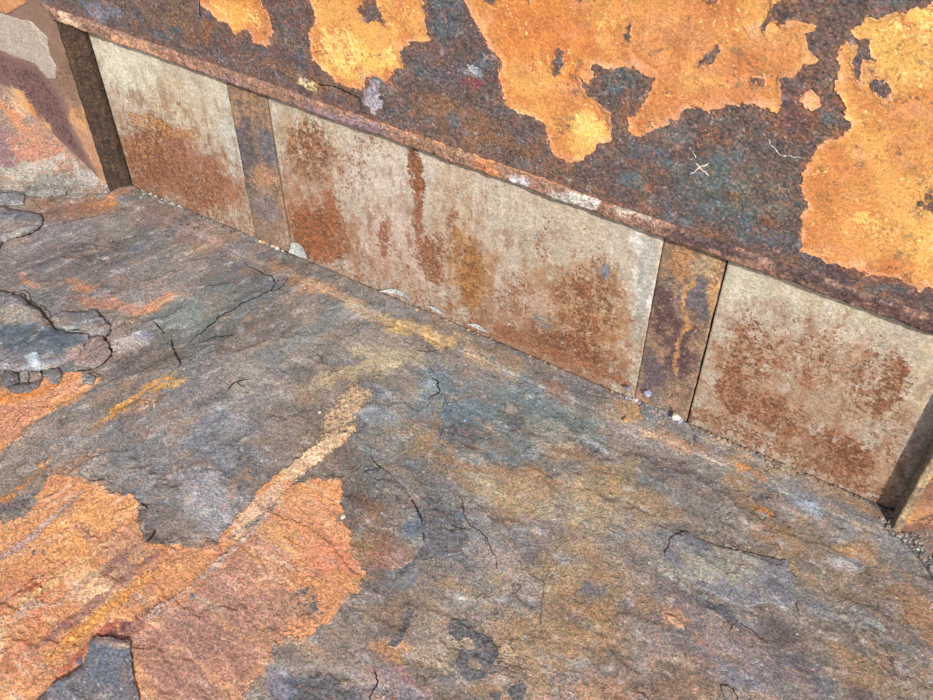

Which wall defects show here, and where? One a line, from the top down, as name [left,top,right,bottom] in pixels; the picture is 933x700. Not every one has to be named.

rust [0,0,82,157]
rust [126,111,200,141]
rust [294,151,445,306]
rust [451,225,485,312]
crack [11,289,113,371]
crack [153,261,288,367]
peeling [2,368,62,386]
rust [640,402,673,425]
rust [698,410,882,500]